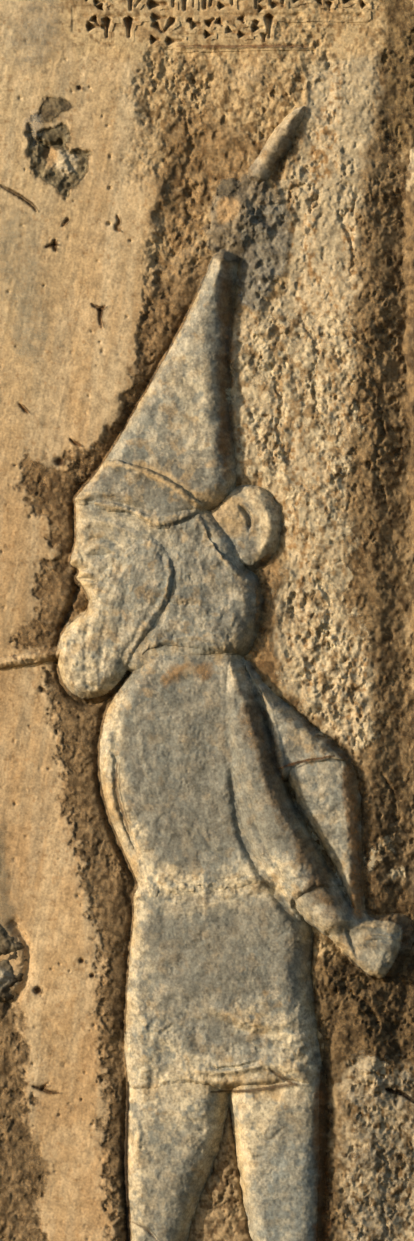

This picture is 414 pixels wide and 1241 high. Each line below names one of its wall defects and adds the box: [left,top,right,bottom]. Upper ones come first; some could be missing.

spalling [26,97,91,198]
crack [279,755,335,769]